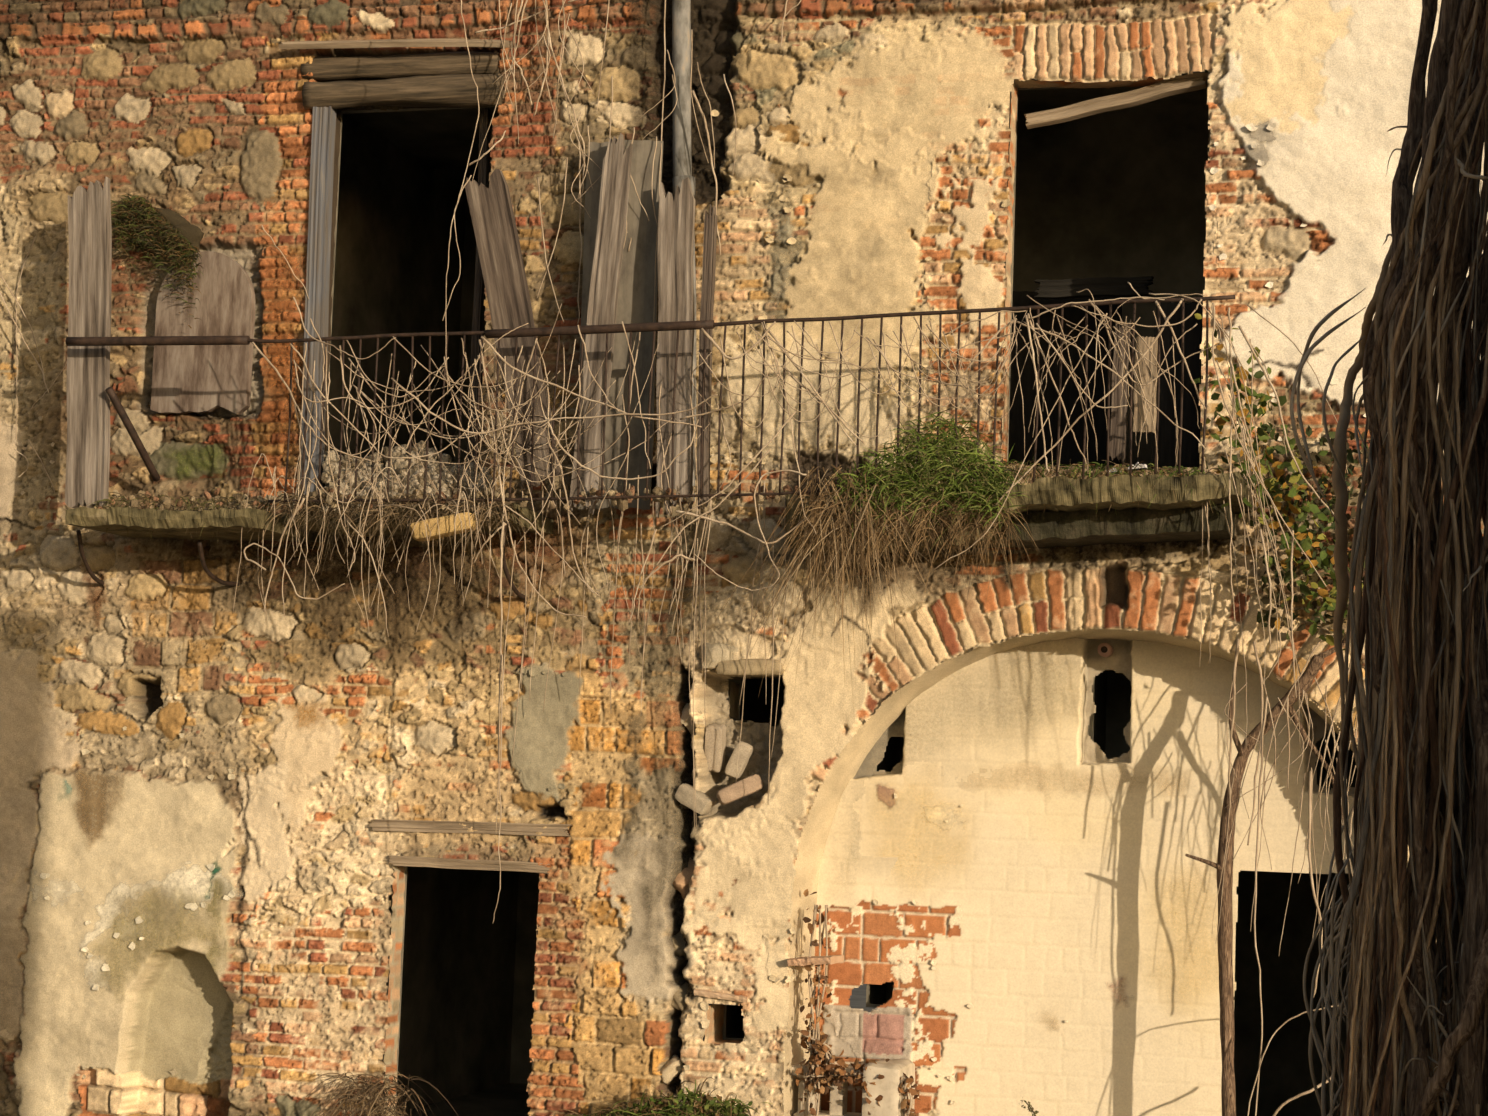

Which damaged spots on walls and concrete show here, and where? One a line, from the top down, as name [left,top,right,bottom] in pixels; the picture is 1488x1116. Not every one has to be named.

spalling [709,93,803,320]
spalling [920,147,1011,432]
spalling [1204,121,1339,294]
peeling [32,870,85,906]
water stain [64,771,119,842]
spalling [75,1065,231,1116]
peeling [80,862,235,991]
crack [671,665,700,1094]
peeling [822,899,973,1114]